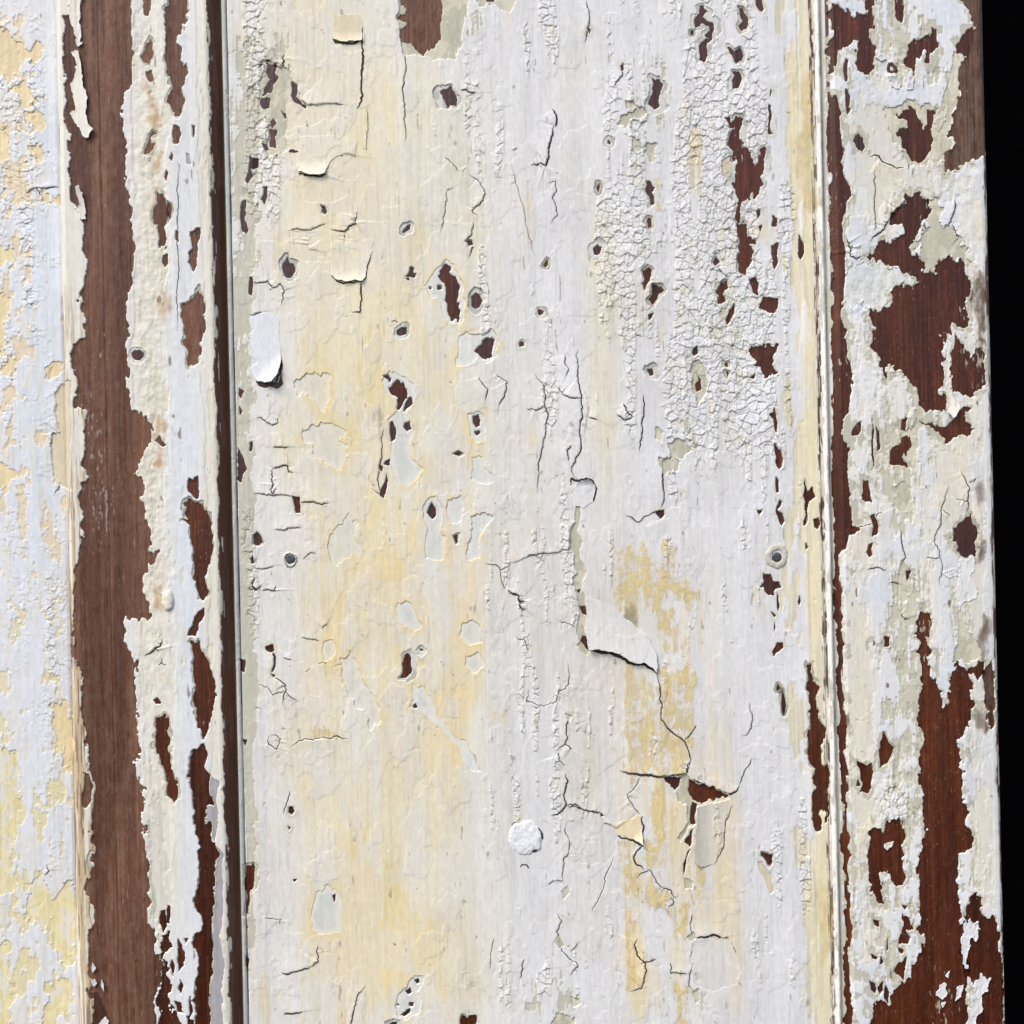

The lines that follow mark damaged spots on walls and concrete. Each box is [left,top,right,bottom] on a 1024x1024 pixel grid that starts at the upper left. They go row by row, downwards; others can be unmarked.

peeling [396,0,516,60]
crack [513,109,558,255]
peeling [711,91,779,325]
peeling [406,260,499,367]
peeling [373,371,423,498]
crack [528,351,645,501]
peeling [0,0,225,1024]
peeling [803,0,1004,1024]
crack [526,650,753,992]